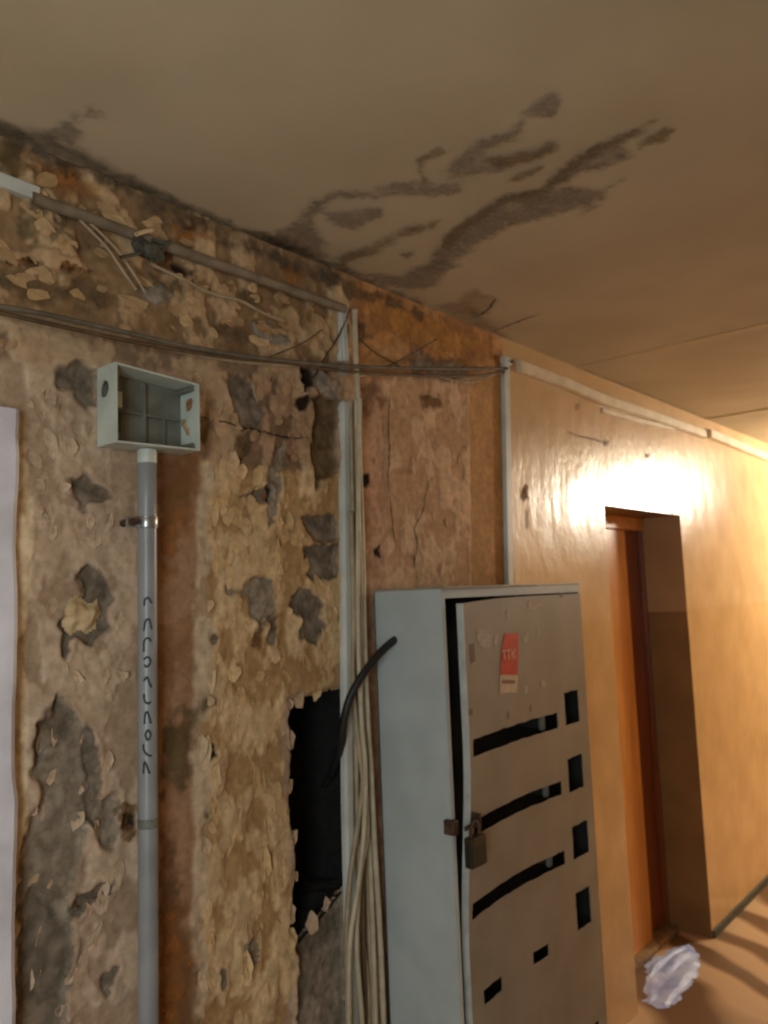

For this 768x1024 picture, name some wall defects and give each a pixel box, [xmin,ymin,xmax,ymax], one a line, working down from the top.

peeling [0,240,58,301]
peeling [18,171,78,251]
peeling [78,201,295,347]
damp [0,123,636,321]
peeling [27,359,97,491]
flaking render [59,475,114,549]
crack [201,416,308,439]
crack [384,391,429,583]
flaking render [47,565,125,683]
spalling [197,368,346,1024]
flaking render [15,695,125,1024]